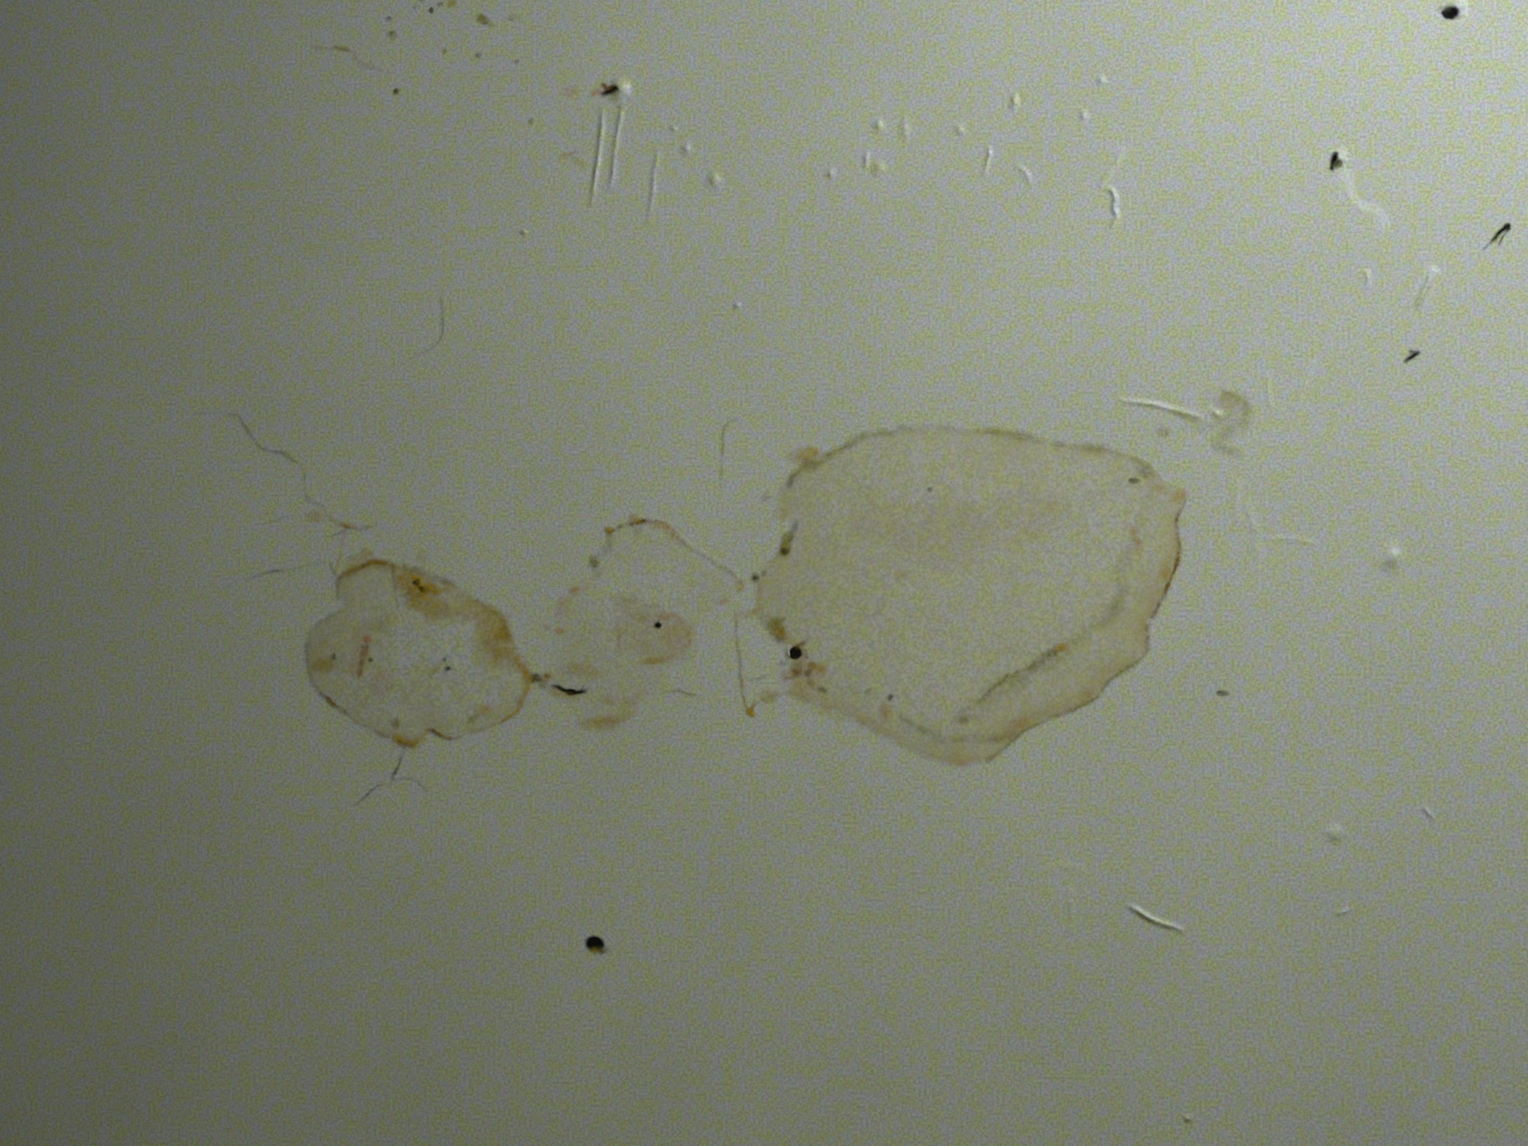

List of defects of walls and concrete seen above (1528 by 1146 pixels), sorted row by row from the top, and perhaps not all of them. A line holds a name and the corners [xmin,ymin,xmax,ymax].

leakage [307,424,1189,767]